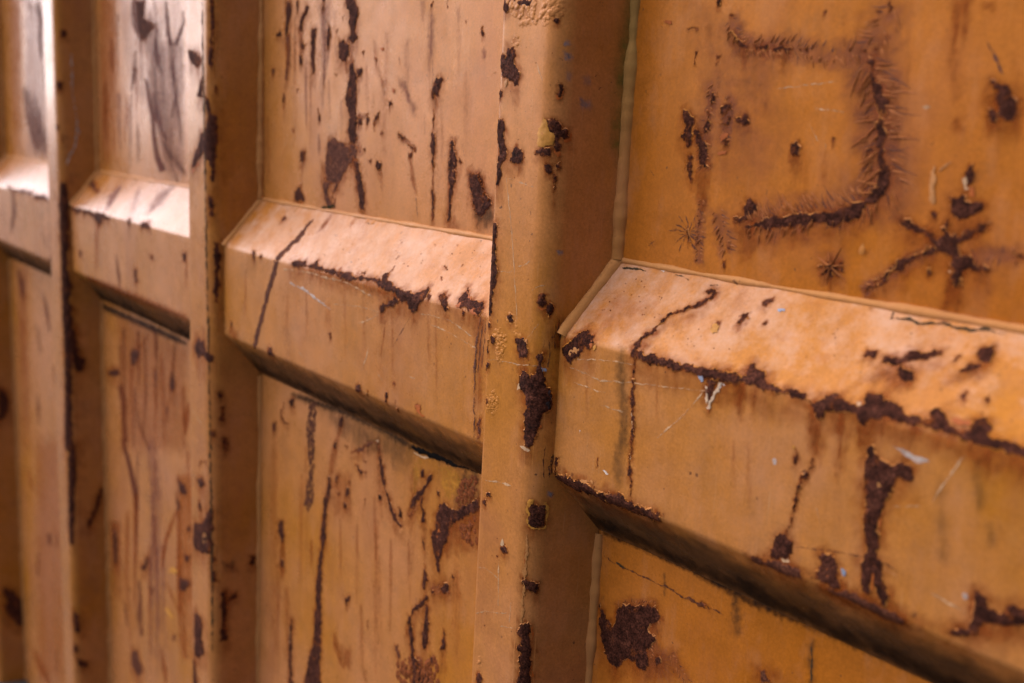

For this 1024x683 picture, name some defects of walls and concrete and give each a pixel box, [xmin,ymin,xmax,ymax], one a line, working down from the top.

corrosion [272,0,395,211]
corrosion [291,77,572,370]
corrosion [680,84,751,184]
corrosion [716,0,1024,307]
corrosion [394,469,491,683]
corrosion [515,337,554,452]
corrosion [598,598,660,671]
corrosion [635,344,1024,625]